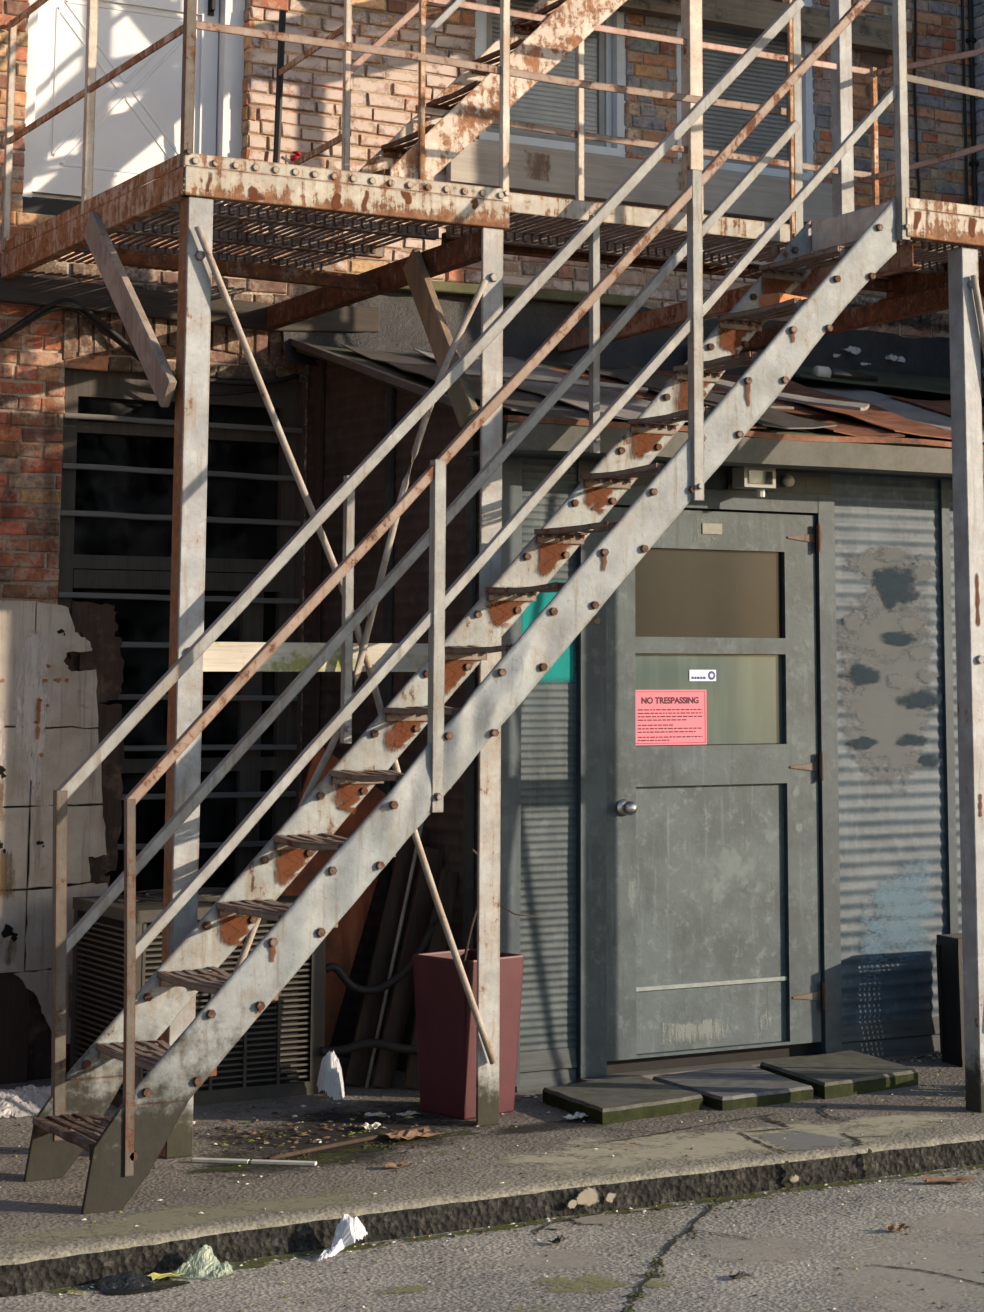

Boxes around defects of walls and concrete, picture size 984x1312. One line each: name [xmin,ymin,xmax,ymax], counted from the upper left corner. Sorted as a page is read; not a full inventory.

rust [248,186,265,201]
rust [332,193,342,210]
rust [969,217,977,237]
rust [585,487,618,514]
rust [536,534,573,576]
rust [487,587,526,627]
rust [444,660,477,695]
peeling [836,546,944,794]
rust [385,721,424,751]
crack [533,1194,751,1312]
crack [871,1264,984,1284]